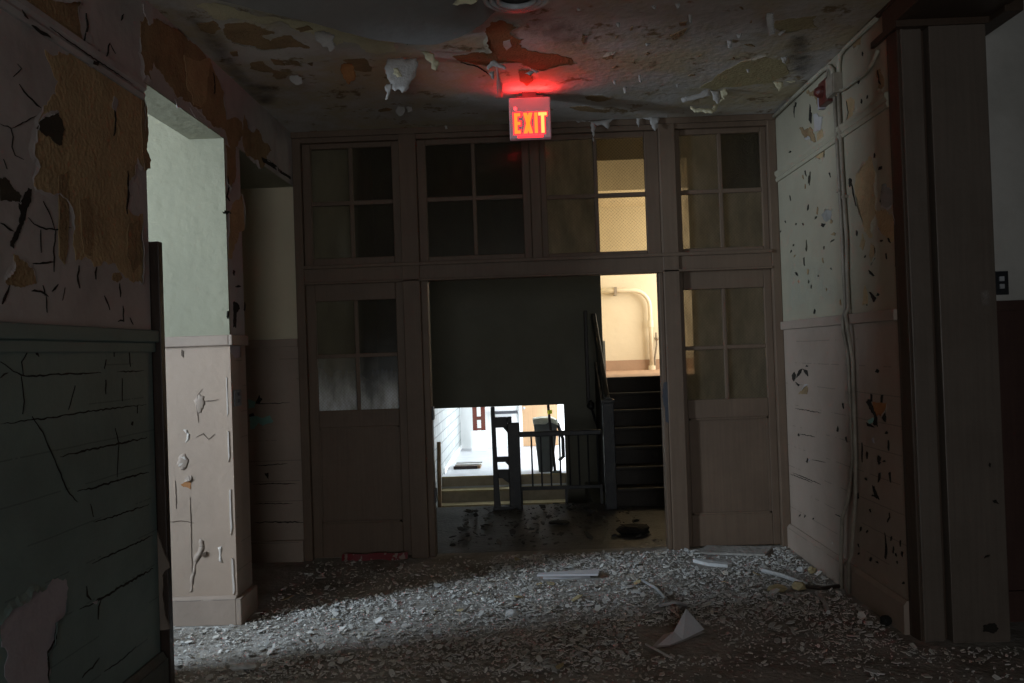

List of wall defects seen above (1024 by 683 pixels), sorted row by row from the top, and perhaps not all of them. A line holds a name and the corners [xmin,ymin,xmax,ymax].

crack [0,64,134,325]
flaking render [29,50,151,286]
flaking render [138,3,291,287]
flaking render [196,19,335,85]
peeling [340,51,439,116]
flaking render [452,18,577,98]
peeling [681,89,728,116]
flaking render [848,153,895,306]
peeling [226,301,246,328]
crack [0,352,149,522]
peeling [0,578,68,683]
crack [80,536,153,620]